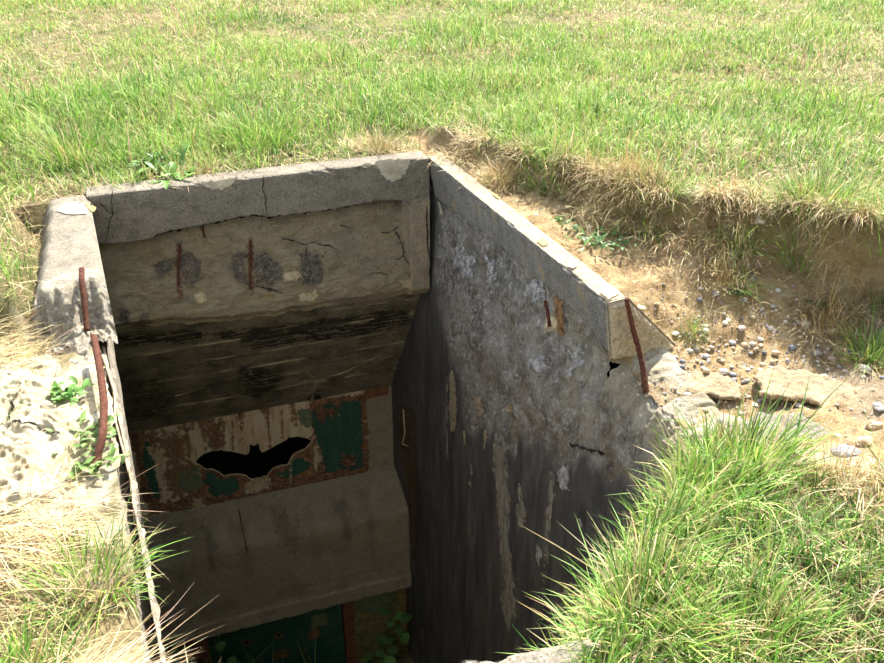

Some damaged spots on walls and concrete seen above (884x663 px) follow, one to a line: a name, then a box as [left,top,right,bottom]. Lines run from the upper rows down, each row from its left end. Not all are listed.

spalling [362,158,410,182]
crack [155,177,356,236]
water stain [153,251,201,283]
spalling [99,200,411,329]
water stain [230,247,284,286]
crack [281,238,336,256]
water stain [298,250,323,286]
rust [552,296,565,336]
spalling [595,286,748,506]
spalling [0,267,200,663]
rust [128,393,369,516]
spalling [796,450,884,478]